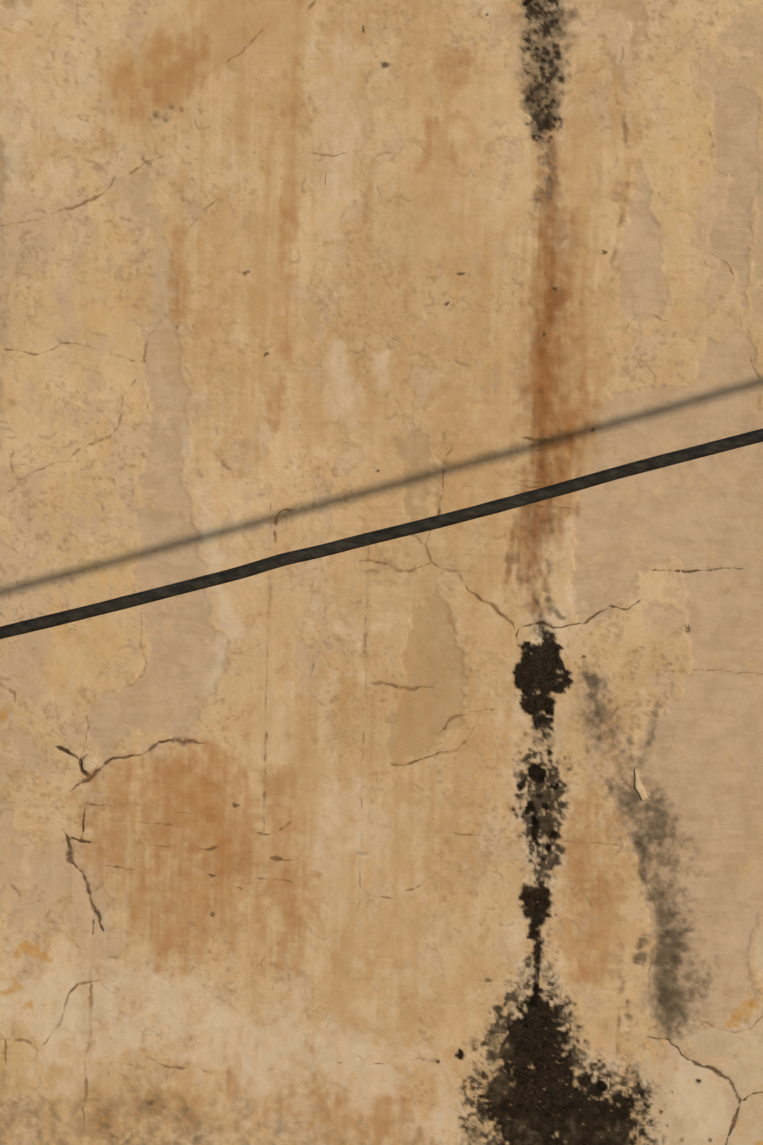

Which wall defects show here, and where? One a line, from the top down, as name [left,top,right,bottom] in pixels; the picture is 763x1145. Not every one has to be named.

leakage [21,469,149,697]
crack [53,502,297,936]
leakage [0,509,762,1145]
leakage [87,0,724,576]
crack [357,424,642,953]
corrosion [497,132,607,628]
crack [442,832,763,1145]
corrosion [607,92,635,284]
crack [638,566,744,574]
crack [633,667,763,675]